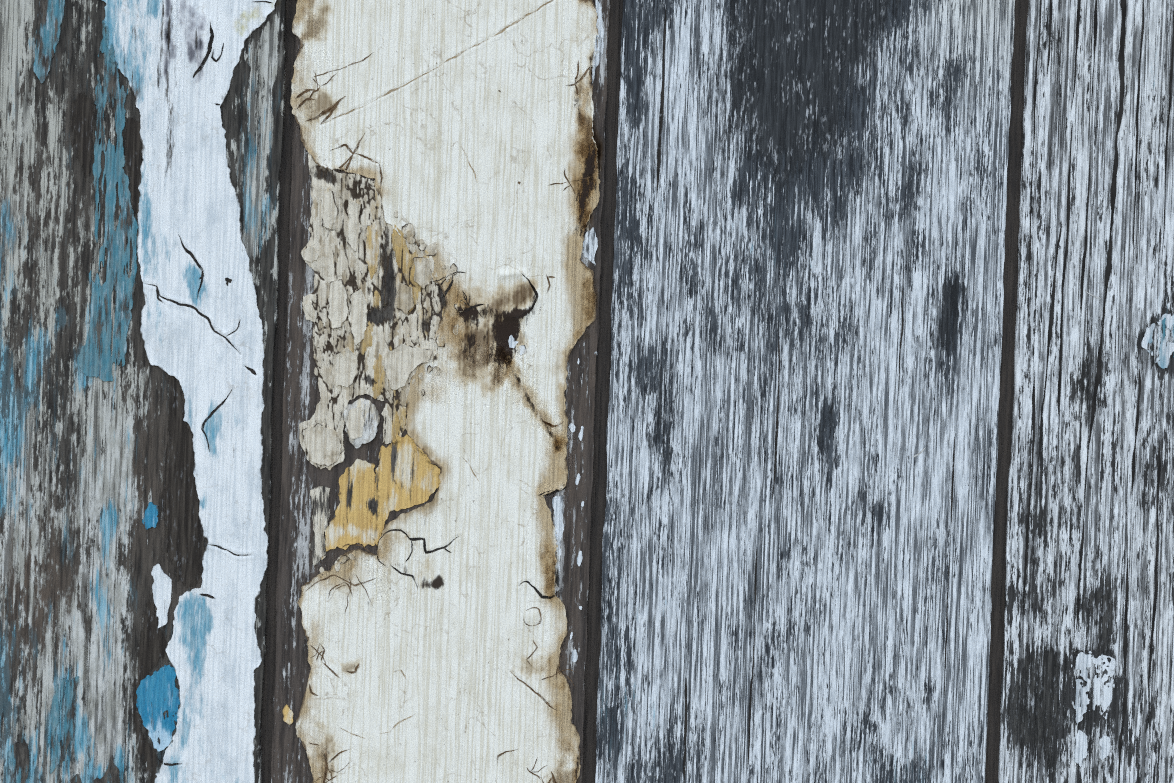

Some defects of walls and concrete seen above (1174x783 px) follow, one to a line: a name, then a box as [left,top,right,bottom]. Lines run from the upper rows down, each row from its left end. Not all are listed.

peeling [33,0,65,84]
crack [296,1,550,190]
peeling [699,0,926,201]
peeling [70,0,277,783]
crack [145,234,256,452]
peeling [283,0,604,783]
crack [433,271,484,314]
damp [457,285,537,412]
crack [513,274,555,318]
peeling [1141,314,1174,369]
crack [305,529,457,612]
peeling [1009,573,1118,776]